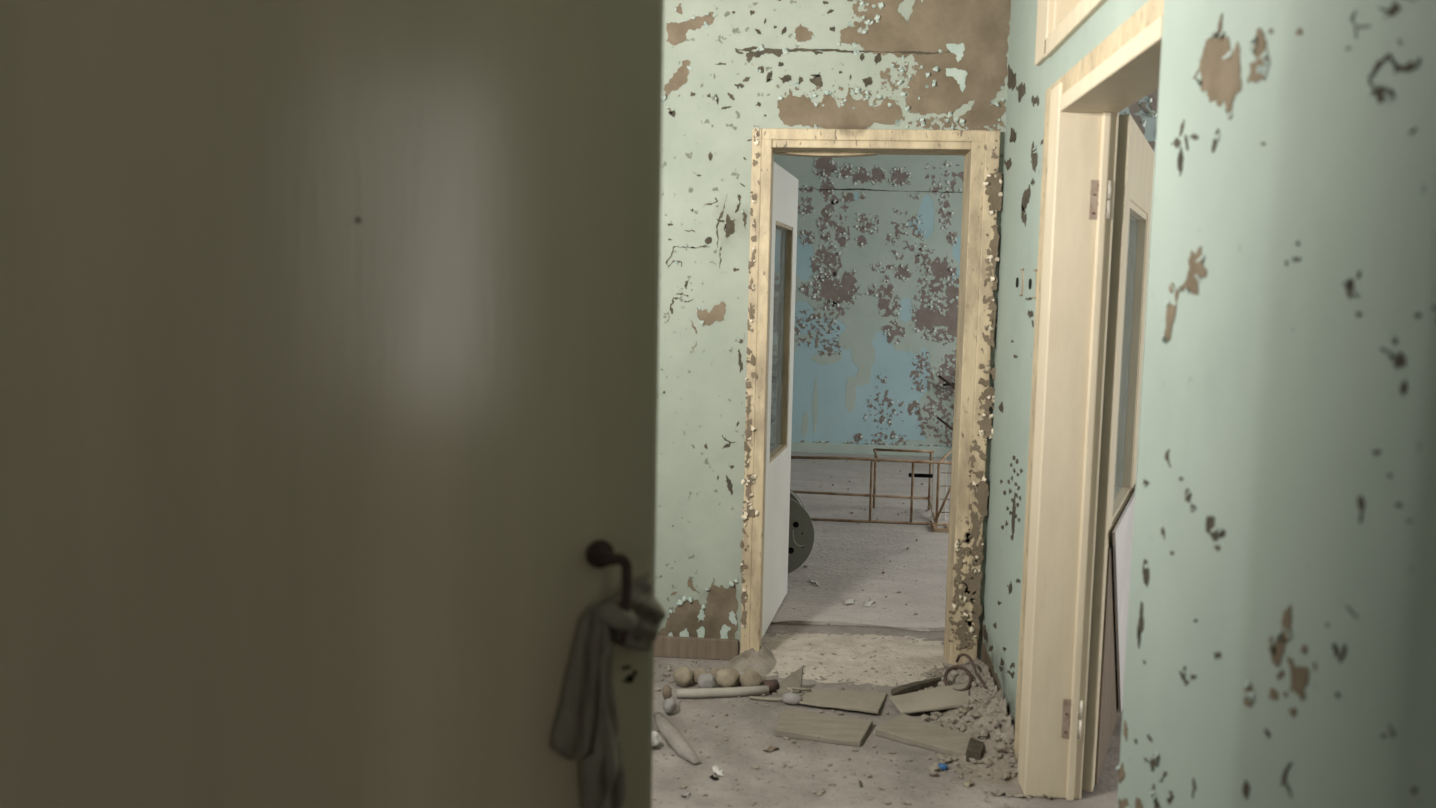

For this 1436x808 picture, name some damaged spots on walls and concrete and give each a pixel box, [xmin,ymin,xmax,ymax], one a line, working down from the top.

peeling [1125,13,1273,176]
peeling [1162,246,1207,344]
peeling [658,0,1044,721]
peeling [1243,605,1317,717]
peeling [1330,643,1347,663]
peeling [1116,763,1143,808]
peeling [1123,720,1168,782]